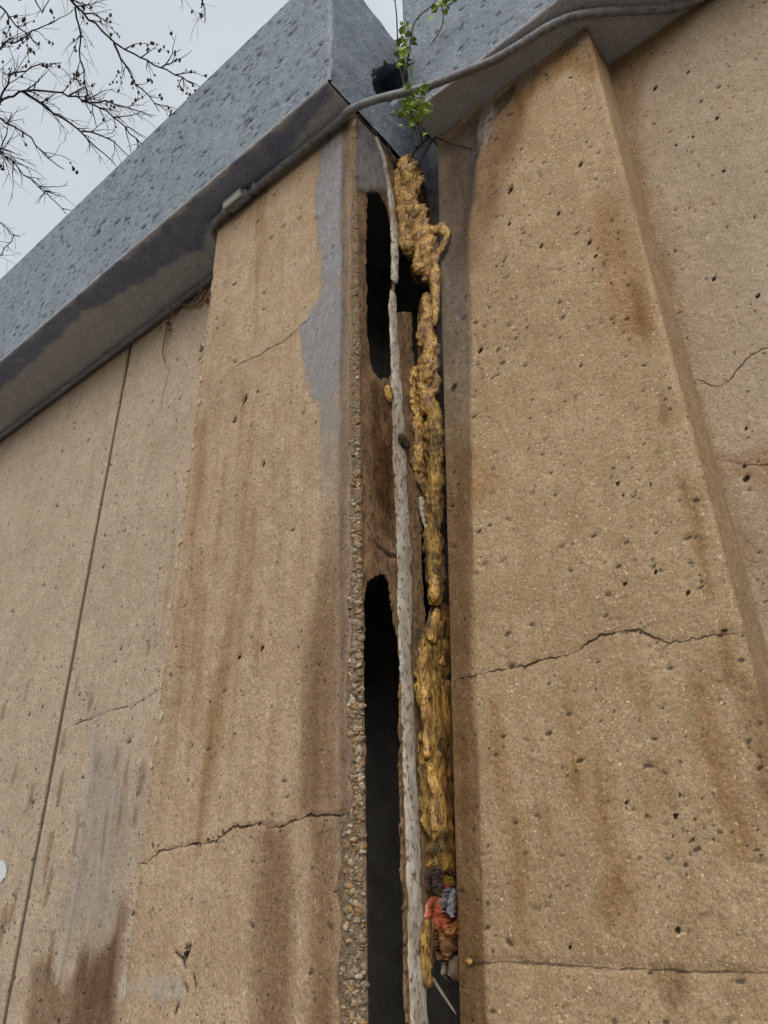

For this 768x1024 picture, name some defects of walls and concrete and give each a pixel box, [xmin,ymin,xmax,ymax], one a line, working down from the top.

crack [697,347,768,386]
spalling [335,126,371,1024]
crack [459,625,746,679]
crack [139,812,347,864]
crack [466,961,767,973]